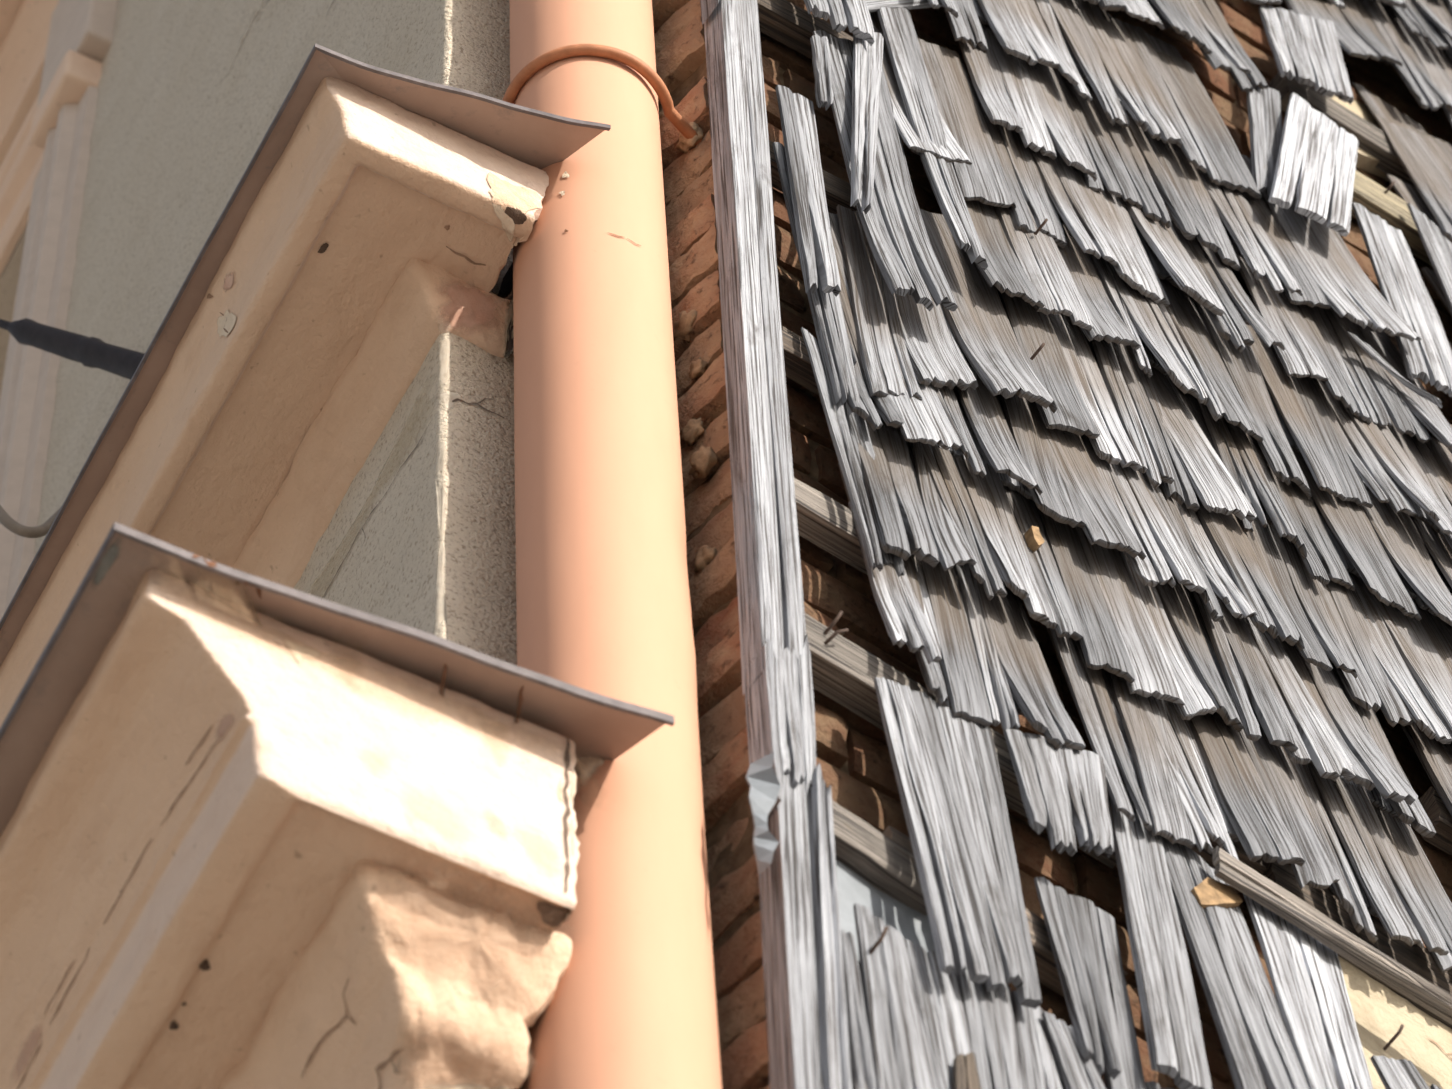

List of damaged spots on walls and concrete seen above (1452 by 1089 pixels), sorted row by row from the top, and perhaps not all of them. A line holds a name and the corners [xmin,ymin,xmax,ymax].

spalling [487,172,542,242]
spalling [497,262,514,357]
crack [559,738,576,893]
spalling [537,902,570,928]
crack [301,978,357,1078]
crack [375,1049,404,1089]